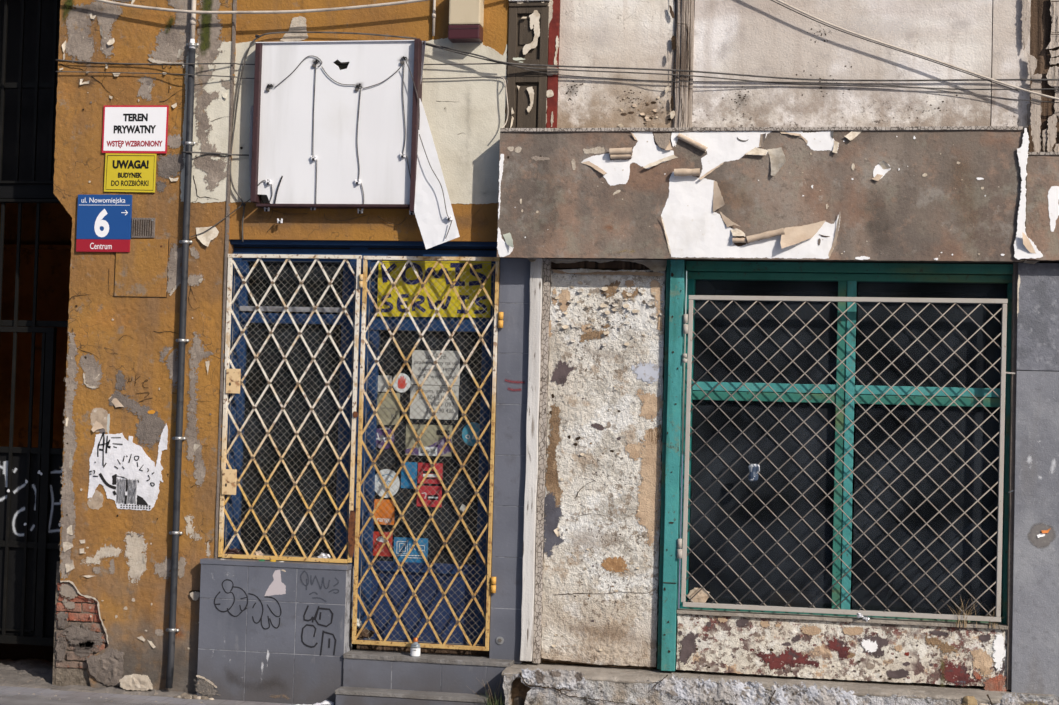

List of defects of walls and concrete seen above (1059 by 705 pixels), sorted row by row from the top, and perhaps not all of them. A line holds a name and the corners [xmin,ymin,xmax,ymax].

peeling [59,0,135,110]
peeling [137,0,230,193]
peeling [517,86,554,127]
peeling [513,0,559,76]
peeling [571,97,870,260]
peeling [1048,186,1059,232]
peeling [55,332,187,687]
peeling [159,332,214,487]
peeling [543,359,578,558]
peeling [570,384,676,574]
spalling [511,670,583,705]
peeling [664,616,1007,705]